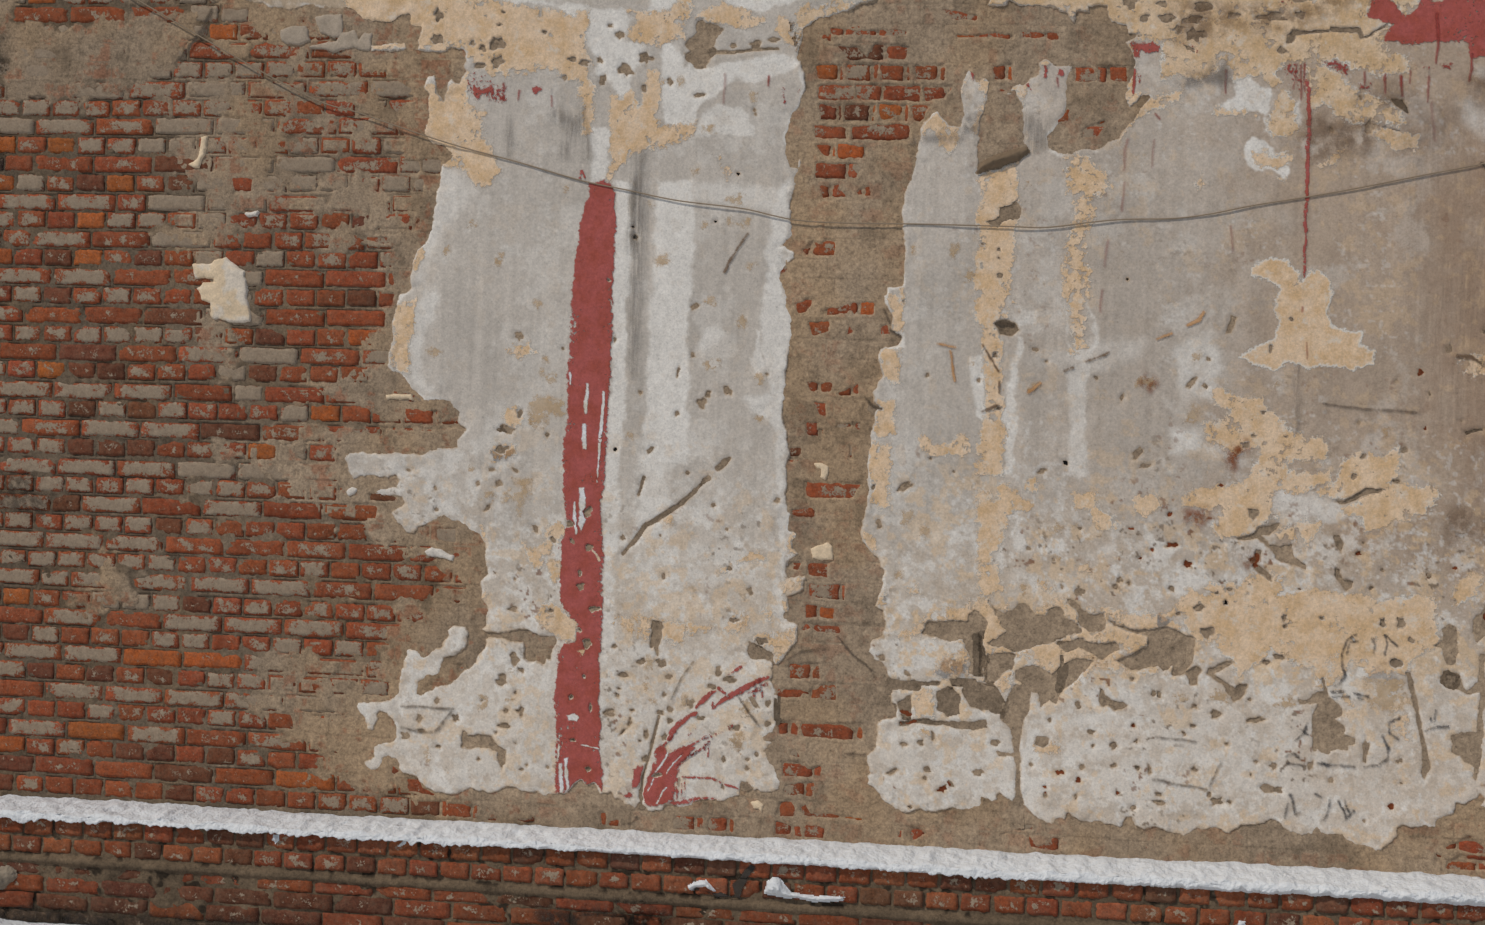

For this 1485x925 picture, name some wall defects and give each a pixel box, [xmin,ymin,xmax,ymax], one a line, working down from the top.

peeling [605,0,767,181]
peeling [1238,256,1376,385]
peeling [469,396,565,514]
peeling [1181,377,1444,570]
peeling [611,611,750,670]
spalling [462,691,524,767]
peeling [567,672,629,721]
spalling [639,683,705,777]
spalling [923,766,954,793]
spalling [1099,689,1127,711]
spalling [1250,760,1282,793]
spalling [1440,654,1485,780]